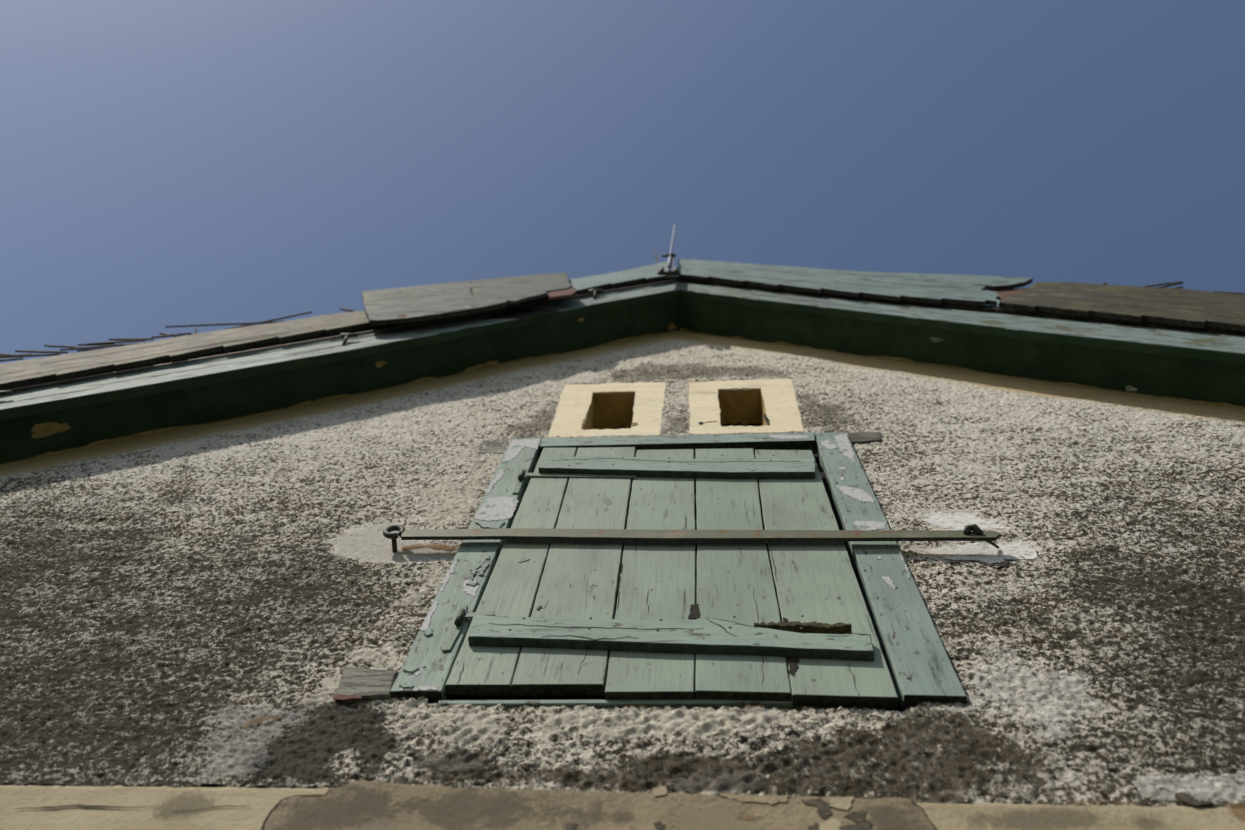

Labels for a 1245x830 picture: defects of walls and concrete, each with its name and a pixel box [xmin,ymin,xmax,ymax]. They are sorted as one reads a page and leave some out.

peeling [31,422,71,438]
peeling [474,439,541,529]
peeling [420,554,490,637]
peeling [399,668,438,691]
leakage [238,700,409,784]
spalling [415,747,486,772]
peeling [261,768,938,830]